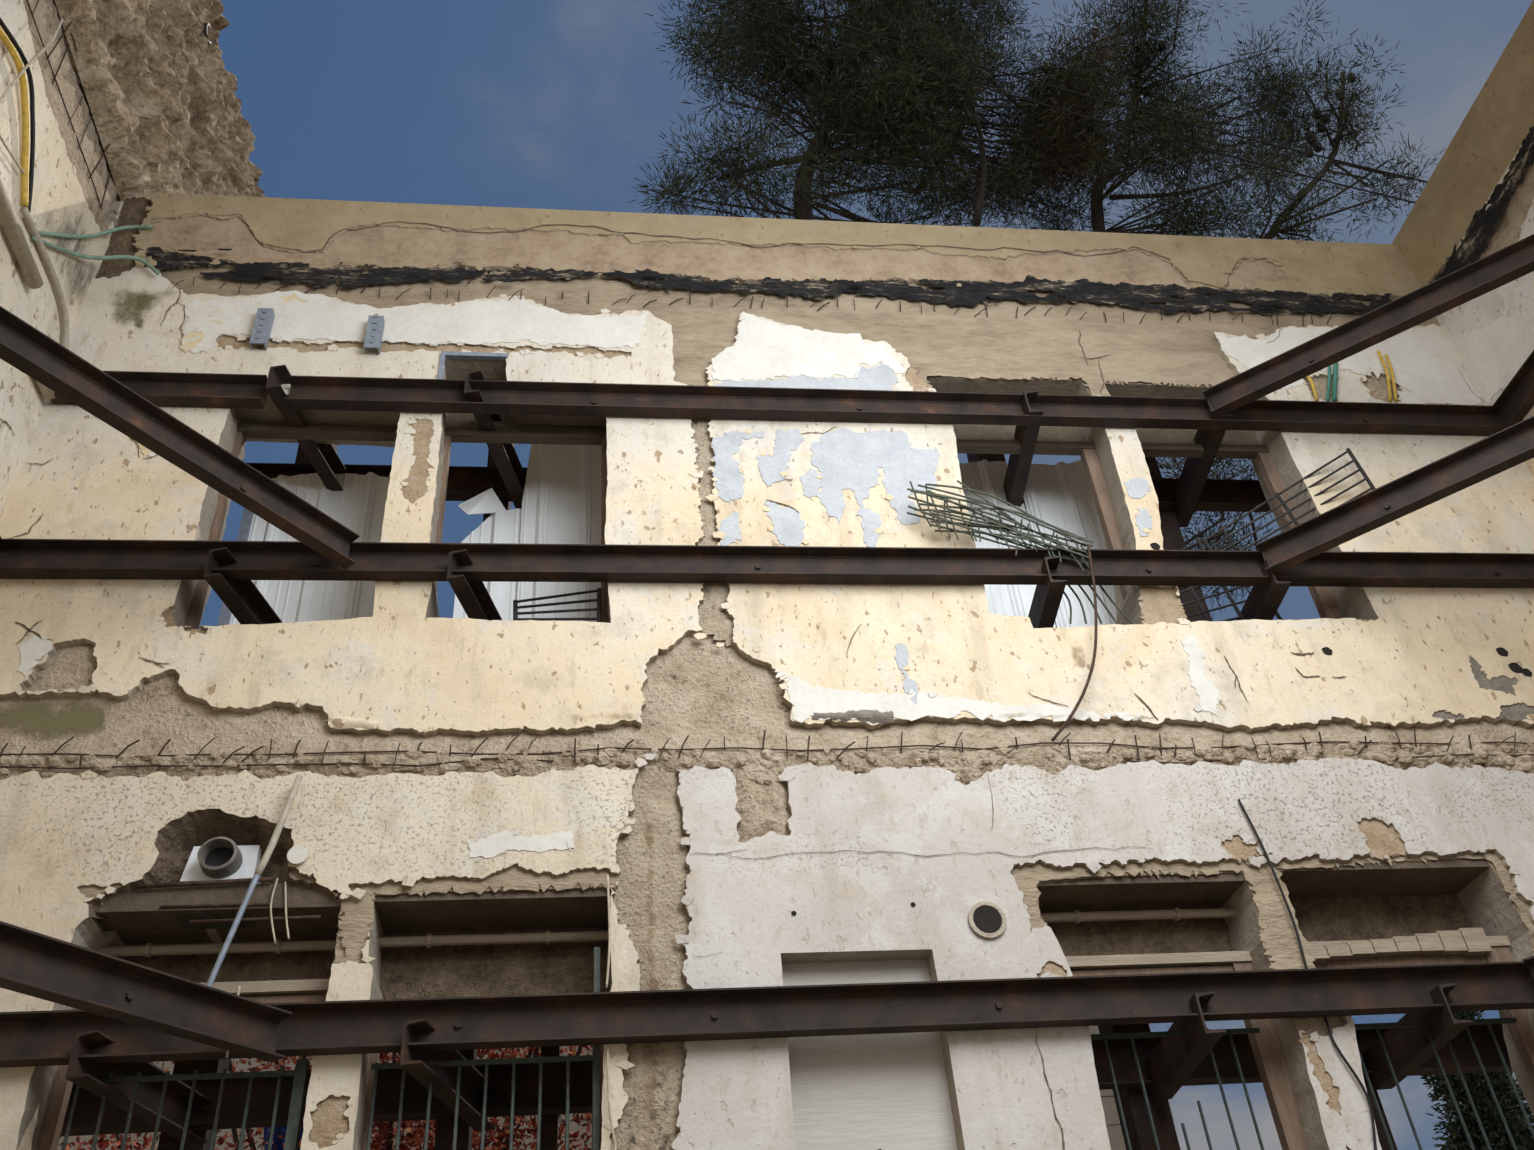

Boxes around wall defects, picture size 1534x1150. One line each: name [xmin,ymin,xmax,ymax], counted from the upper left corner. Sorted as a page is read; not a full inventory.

peeling [27,0,1191,359]
crack [153,213,1280,288]
crack [160,288,185,345]
peeling [705,313,933,392]
flaking render [400,415,434,504]
peeling [688,418,940,547]
damp [0,703,104,738]
peeling [775,643,1153,723]
flaking render [1138,585,1221,717]
flaking render [1469,647,1534,721]
spalling [0,716,1534,991]
spalling [603,1041,687,1150]